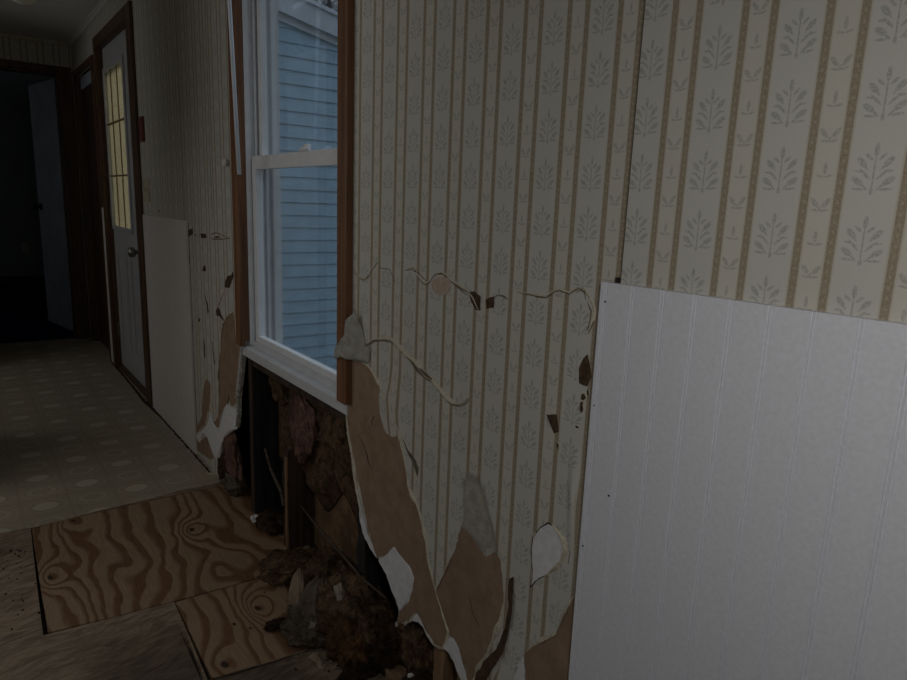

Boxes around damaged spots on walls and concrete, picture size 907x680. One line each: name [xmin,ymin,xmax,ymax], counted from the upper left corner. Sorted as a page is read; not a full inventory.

peeling [334,309,371,364]
flaking render [196,347,244,460]
flaking render [344,409,414,611]
flaking render [530,522,568,588]
flaking render [412,614,467,680]
flaking render [513,657,525,680]